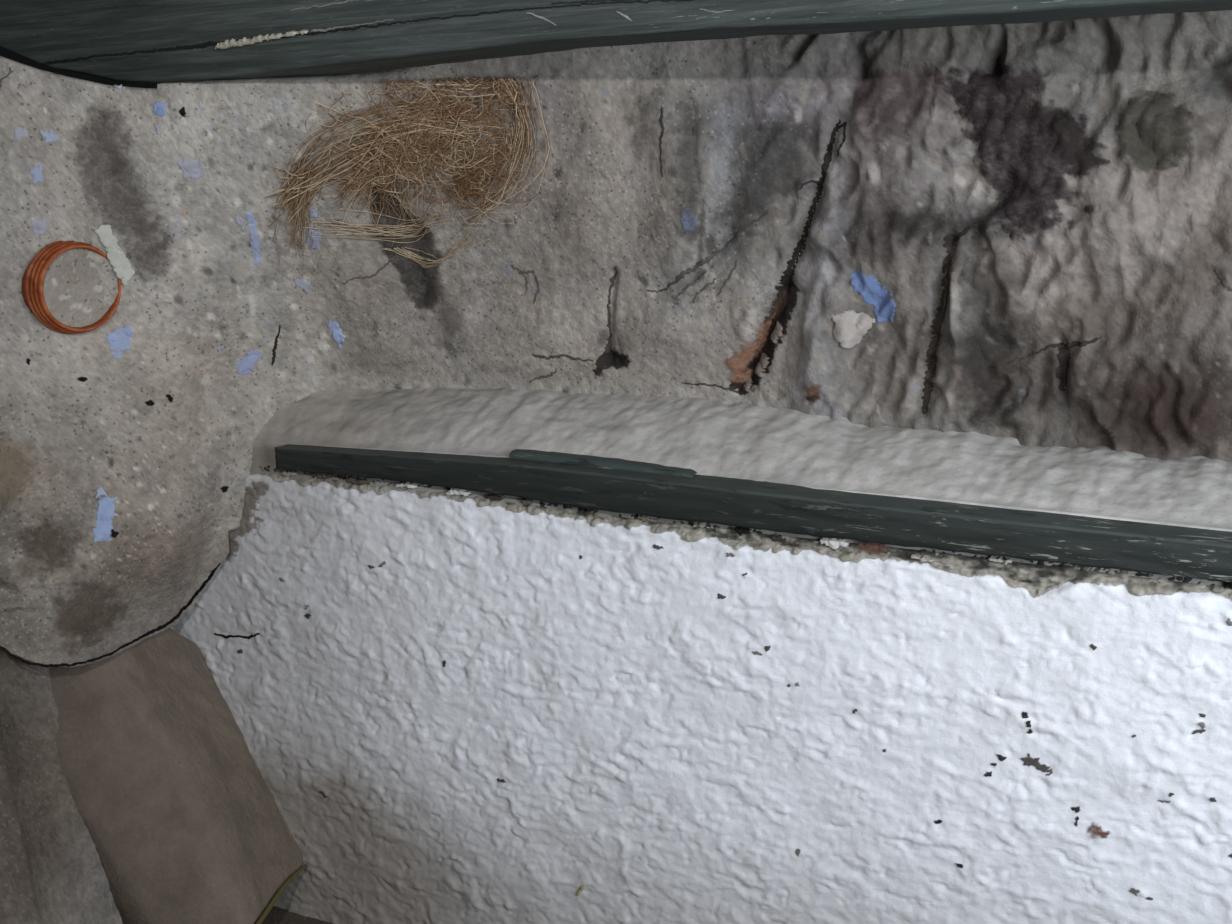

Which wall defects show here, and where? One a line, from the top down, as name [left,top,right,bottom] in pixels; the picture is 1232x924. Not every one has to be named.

crack [779,119,847,286]
leakage [855,65,1191,240]
crack [529,266,630,383]
rust [726,291,787,382]
crack [921,226,970,414]
flaking render [223,465,1232,599]
leakage [56,583,121,653]
crack [1,563,220,668]